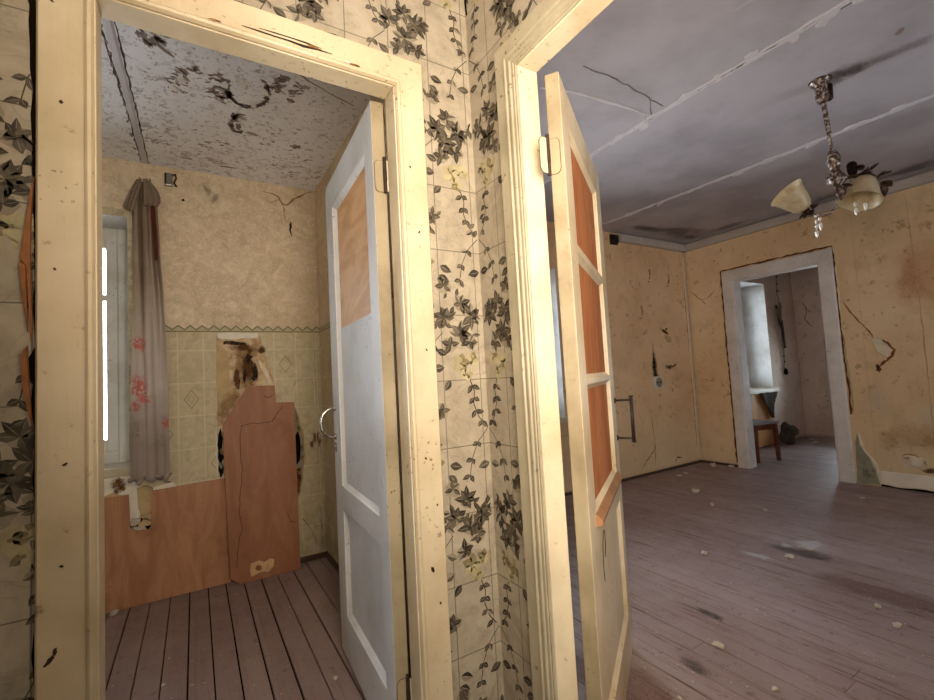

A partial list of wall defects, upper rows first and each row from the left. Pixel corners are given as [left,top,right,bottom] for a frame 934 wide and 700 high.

crack [540,0,864,160]
crack [261,190,311,237]
flaking render [216,332,274,434]
crack [642,245,896,469]